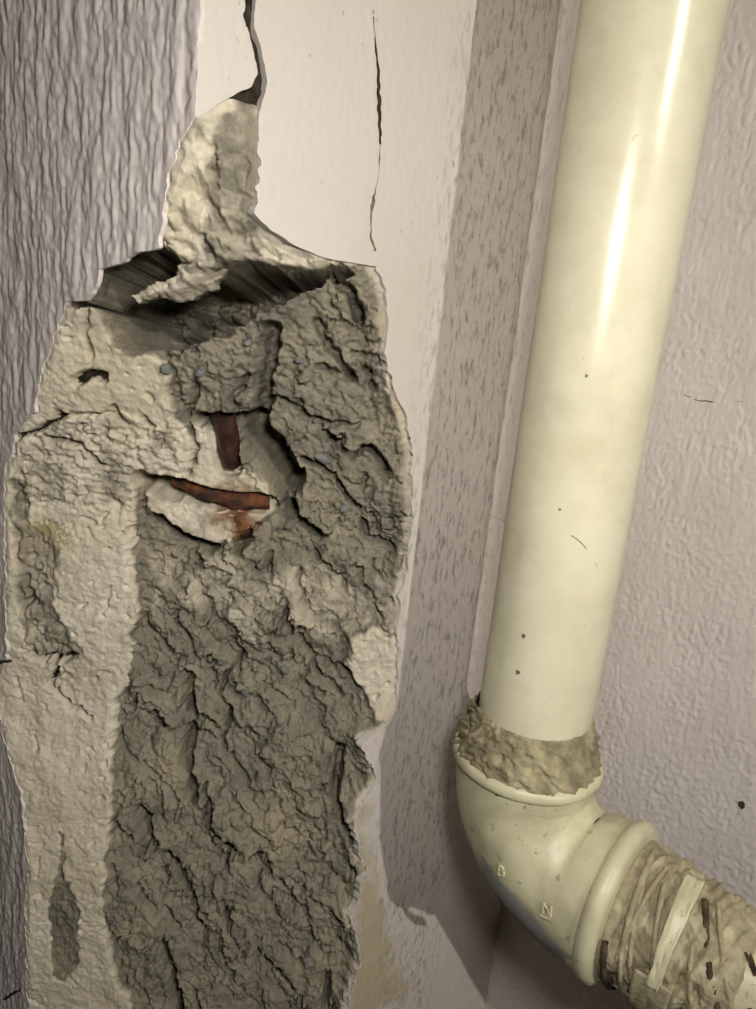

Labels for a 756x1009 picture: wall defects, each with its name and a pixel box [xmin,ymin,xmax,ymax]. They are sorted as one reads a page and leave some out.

crack [229,0,262,106]
crack [370,10,382,251]
spalling [0,95,411,1009]
rust [220,506,252,541]